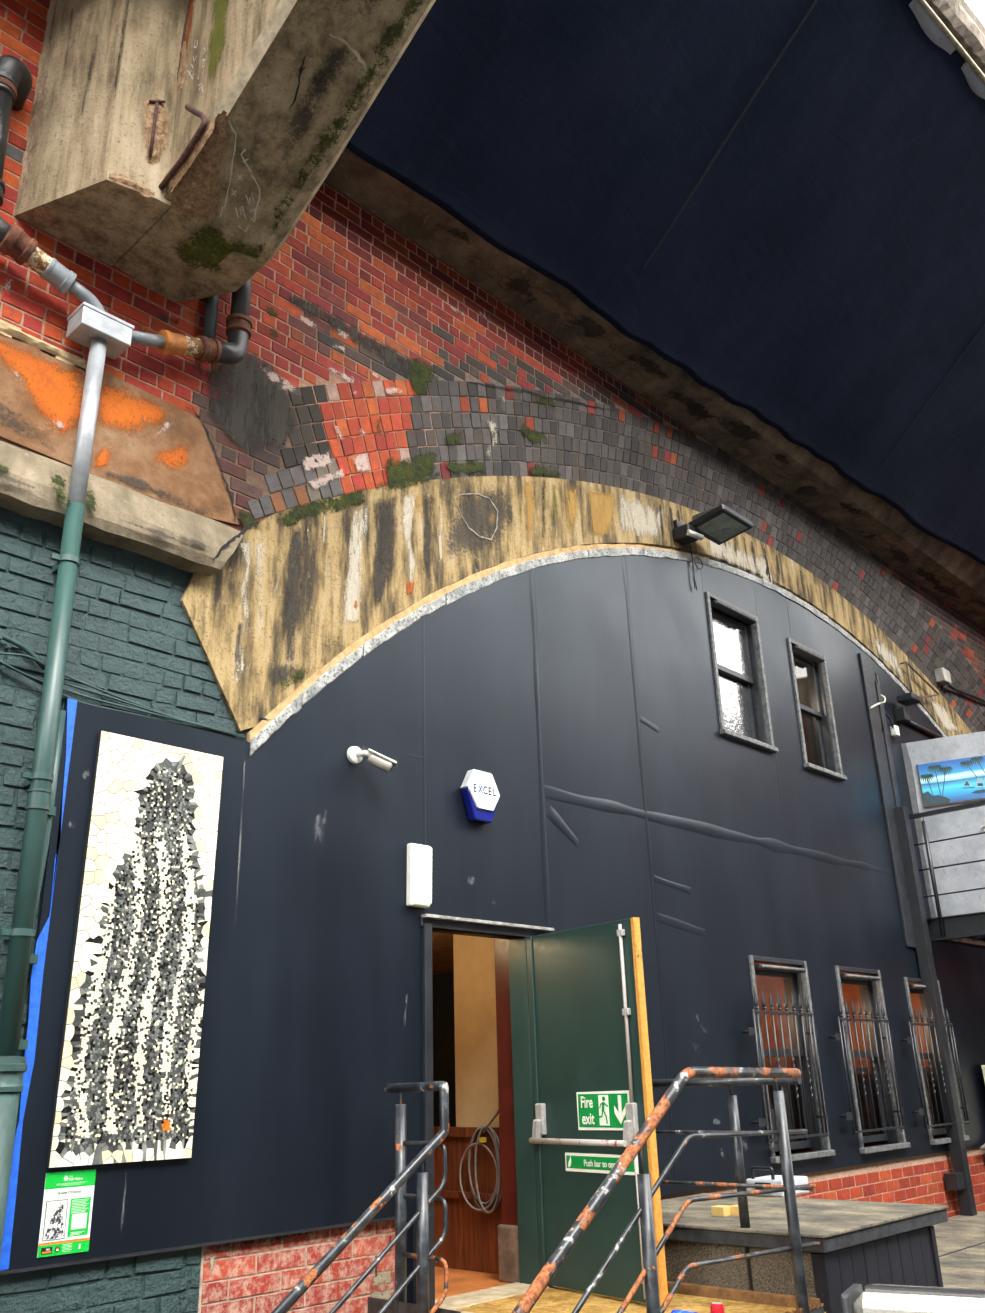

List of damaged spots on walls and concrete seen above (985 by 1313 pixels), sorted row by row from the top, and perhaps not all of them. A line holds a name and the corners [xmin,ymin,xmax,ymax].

leakage [208,0,229,78]
leakage [287,48,348,149]
rust [0,341,83,433]
rust [99,385,165,430]
rust [96,447,111,468]
rust [156,447,190,469]
leakage [344,481,680,622]
leakage [709,537,780,583]
leakage [235,515,326,685]
leakage [875,639,903,679]
leakage [930,698,958,731]